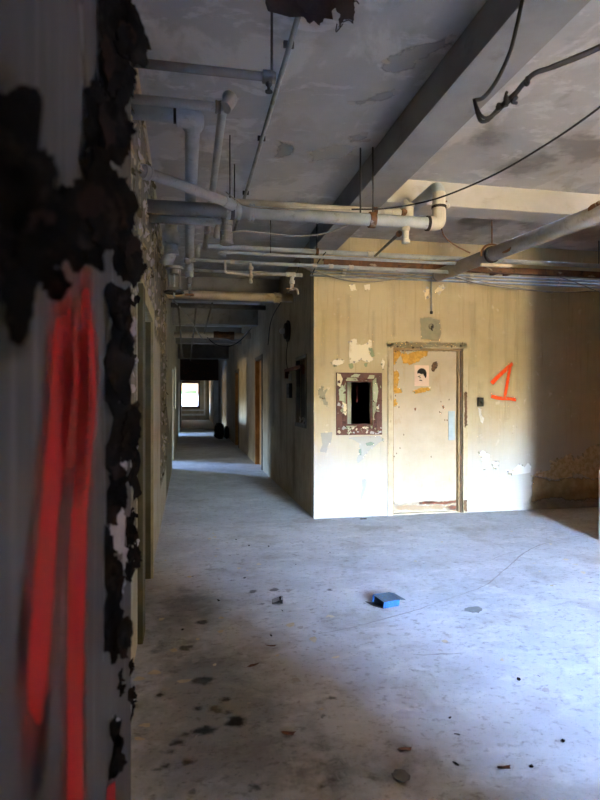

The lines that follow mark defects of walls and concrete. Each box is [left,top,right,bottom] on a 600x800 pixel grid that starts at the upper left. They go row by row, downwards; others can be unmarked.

peeling [0,0,169,781]
peeling [317,386,384,463]
peeling [330,338,466,407]
peeling [478,444,600,502]